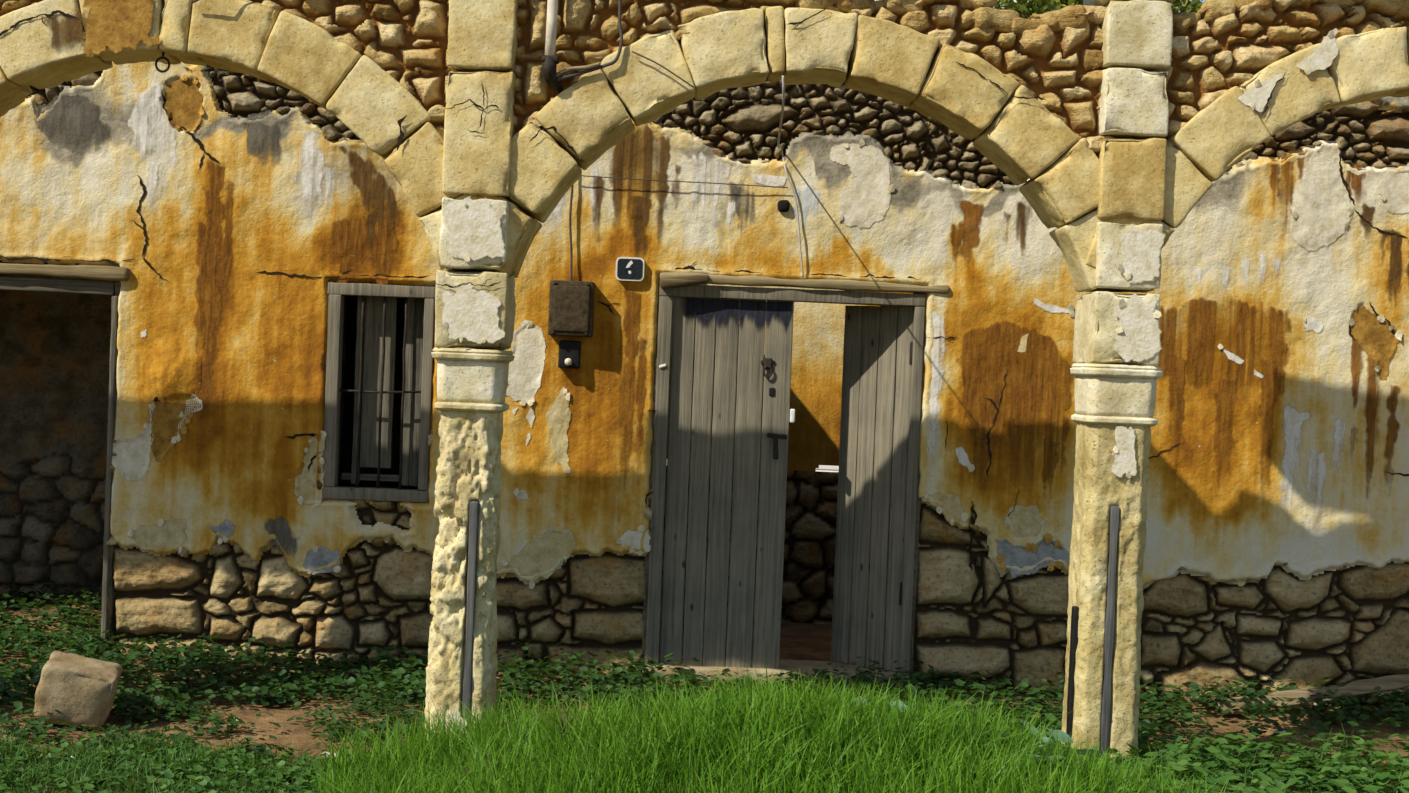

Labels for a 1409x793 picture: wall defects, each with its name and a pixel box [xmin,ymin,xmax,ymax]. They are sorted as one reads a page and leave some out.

crack [0,175,169,282]
peeling [444,197,506,262]
flaking render [830,139,895,228]
flaking render [1292,166,1354,251]
peeling [442,283,571,473]
water stain [926,311,945,454]
peeling [127,517,186,553]
peeling [303,546,341,575]
flaking render [497,525,577,589]
flaking render [616,525,651,556]
flaking render [922,492,969,526]
flaking render [995,504,1070,579]